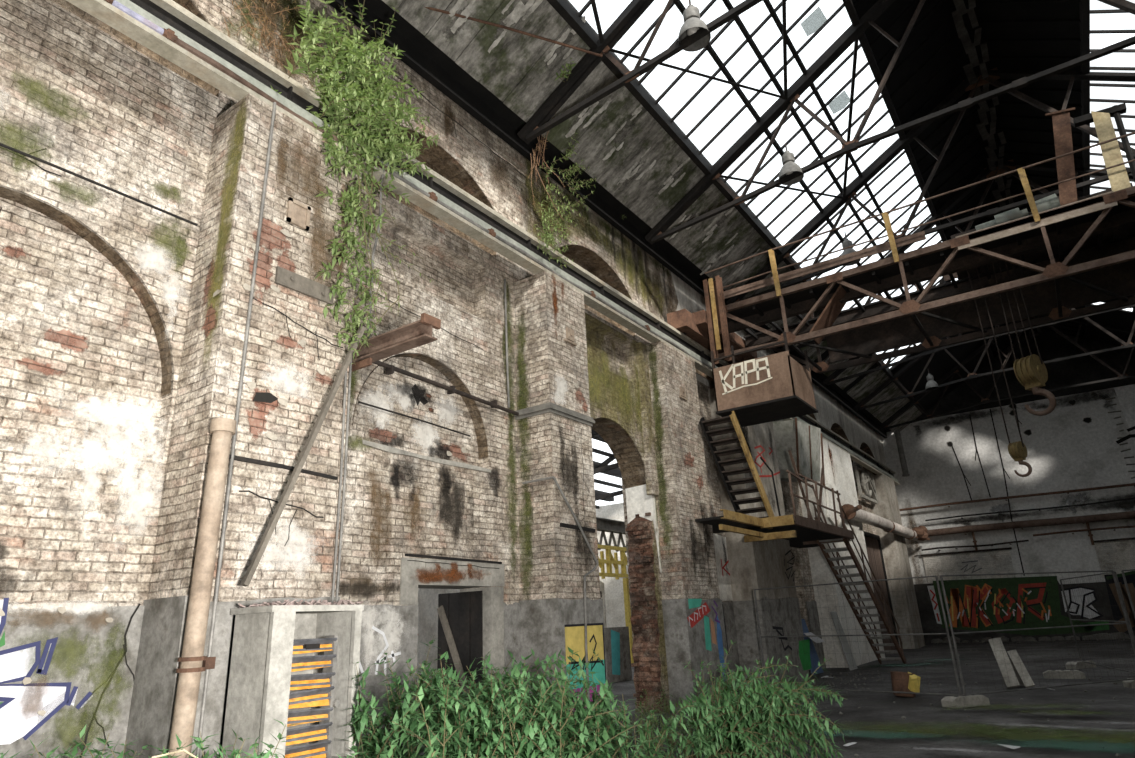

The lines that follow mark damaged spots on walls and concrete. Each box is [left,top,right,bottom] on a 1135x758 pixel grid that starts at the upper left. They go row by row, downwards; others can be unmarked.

spalling [243,218,296,304]
spalling [246,381,288,440]
leakage [33,398,161,530]
leakage [439,477,474,538]